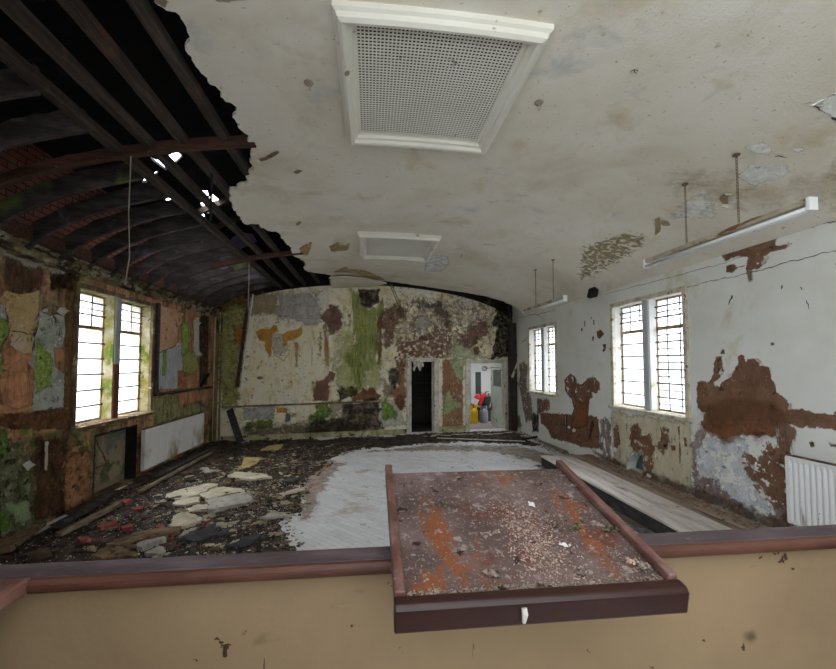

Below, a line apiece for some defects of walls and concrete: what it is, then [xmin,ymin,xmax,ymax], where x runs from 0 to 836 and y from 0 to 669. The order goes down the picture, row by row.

flaking render [2,252,65,274]
spalling [256,291,323,356]
leakage [358,289,380,308]
peeling [379,301,490,385]
crack [606,251,836,308]
peeling [722,239,792,273]
leakage [0,257,96,521]
peeling [313,371,335,401]
peeling [539,373,600,449]
peeling [612,425,620,452]
peeling [630,423,687,478]
peeling [696,350,836,511]